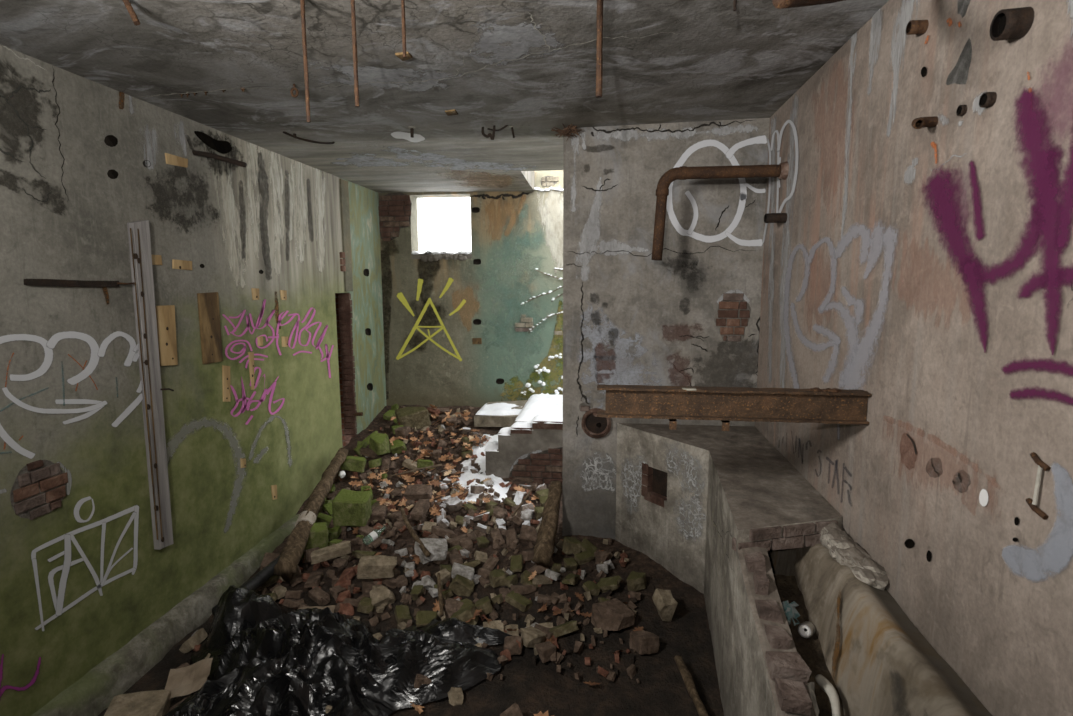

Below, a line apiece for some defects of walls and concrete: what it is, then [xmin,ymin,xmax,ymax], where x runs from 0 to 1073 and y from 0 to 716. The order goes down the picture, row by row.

crack [134,12,692,98]
leakage [0,62,65,215]
leakage [333,146,536,172]
leakage [144,121,326,288]
spalling [378,192,412,241]
peeling [579,304,692,412]
crack [567,200,755,436]
peeling [663,324,702,341]
spalling [714,289,751,342]
crack [748,291,762,375]
spalling [0,459,72,520]